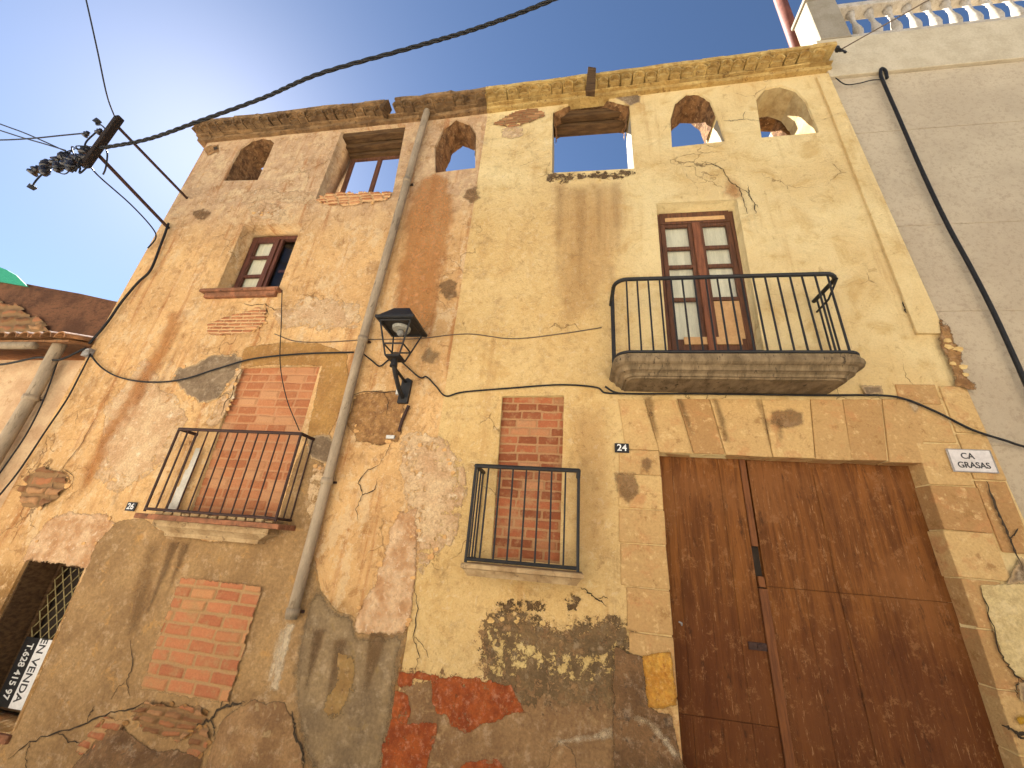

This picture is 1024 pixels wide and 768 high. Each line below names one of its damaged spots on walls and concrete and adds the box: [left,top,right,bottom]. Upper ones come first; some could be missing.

peeling [938,319,976,390]
peeling [93,353,243,492]
damp [771,410,803,427]
spalling [17,466,115,568]
peeling [347,390,468,635]
crack [986,481,1024,572]
crack [10,645,147,768]
crack [197,701,244,736]
damp [270,594,401,768]
peeling [381,607,637,768]
crack [981,588,1024,699]
crack [1002,725,1024,739]